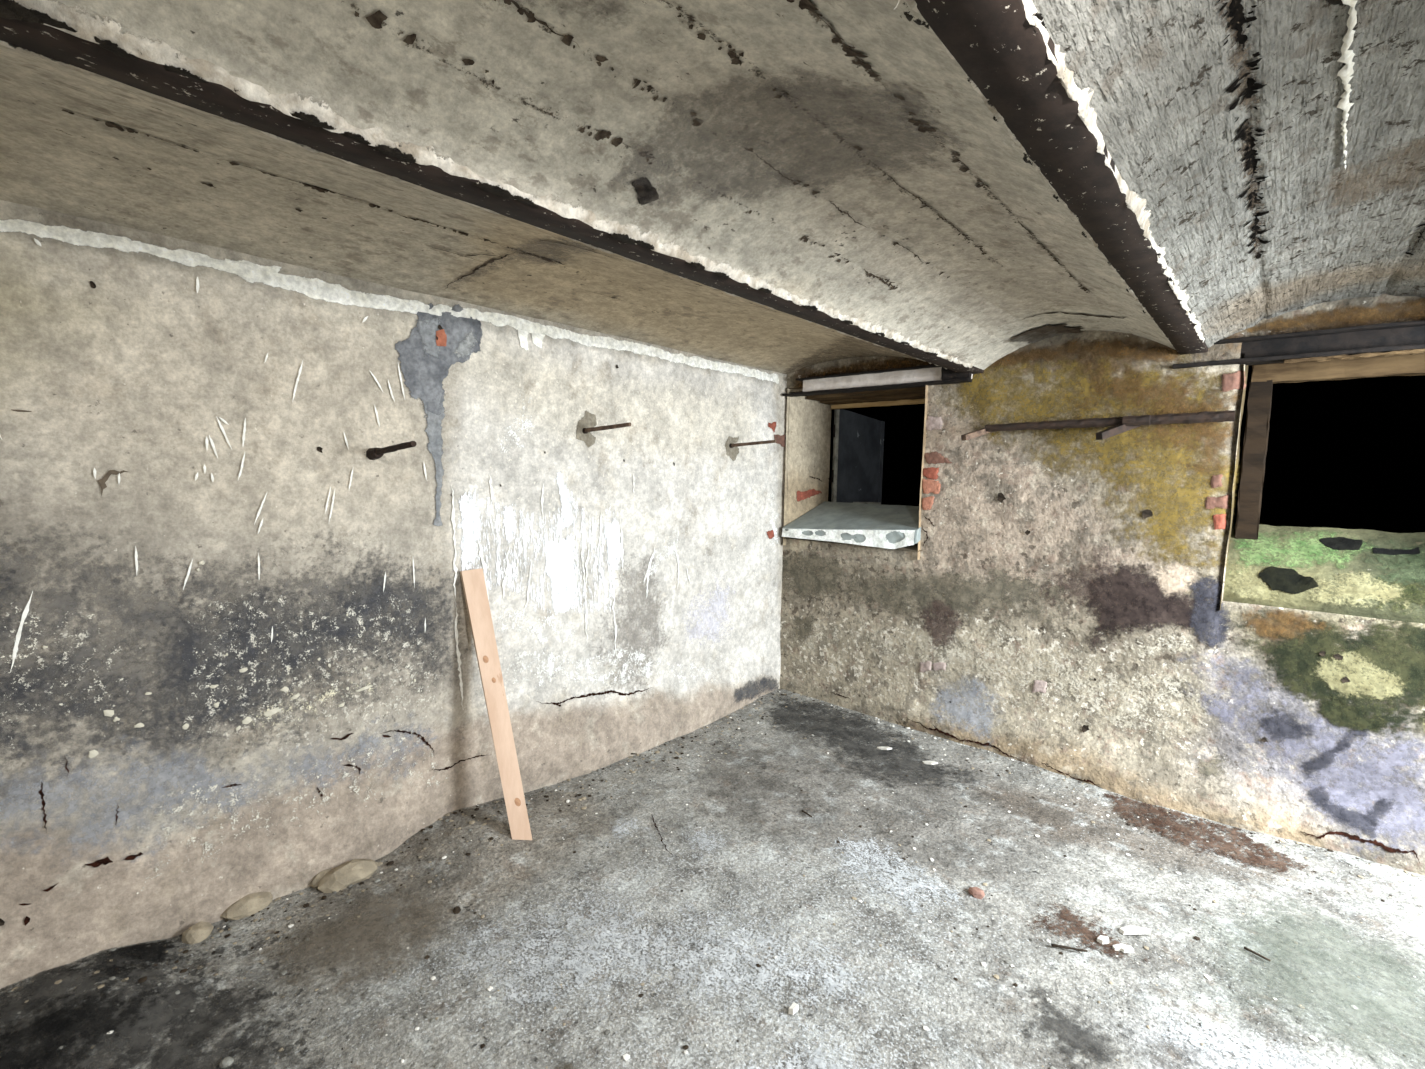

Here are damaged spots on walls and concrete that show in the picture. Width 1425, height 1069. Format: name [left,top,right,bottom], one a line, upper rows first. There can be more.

leakage [195,416,246,481]
leakage [782,338,1425,851]
leakage [0,470,468,858]
crack [536,687,652,707]
leakage [826,830,977,915]
crack [1300,831,1420,863]